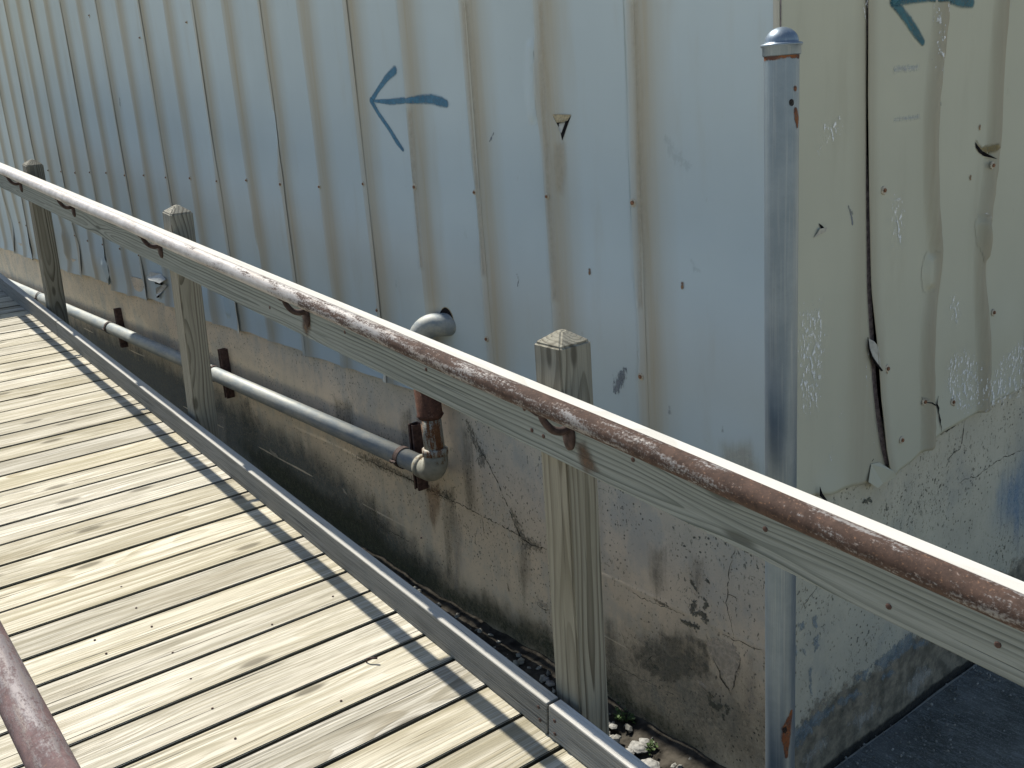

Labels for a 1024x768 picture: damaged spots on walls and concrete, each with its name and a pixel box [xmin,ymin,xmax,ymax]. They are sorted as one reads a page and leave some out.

leakage [69,323,188,415]
leakage [215,395,439,590]
crack [357,431,547,550]
rust [578,446,595,470]
crack [725,551,760,650]
leakage [610,635,754,752]
rust [781,710,793,758]